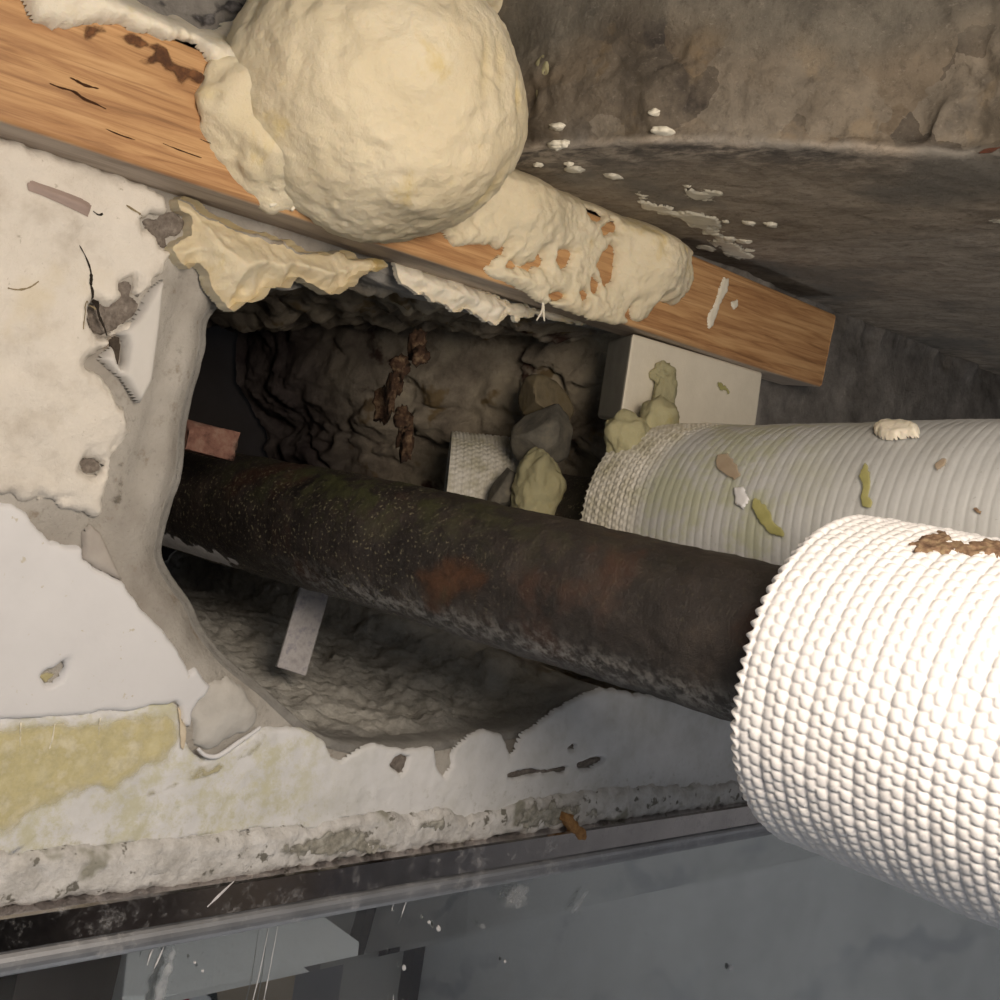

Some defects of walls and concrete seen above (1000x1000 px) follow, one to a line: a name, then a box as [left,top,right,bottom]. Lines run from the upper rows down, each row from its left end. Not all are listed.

crack [79,245,107,336]
flaking render [0,138,738,855]
leakage [0,707,187,828]